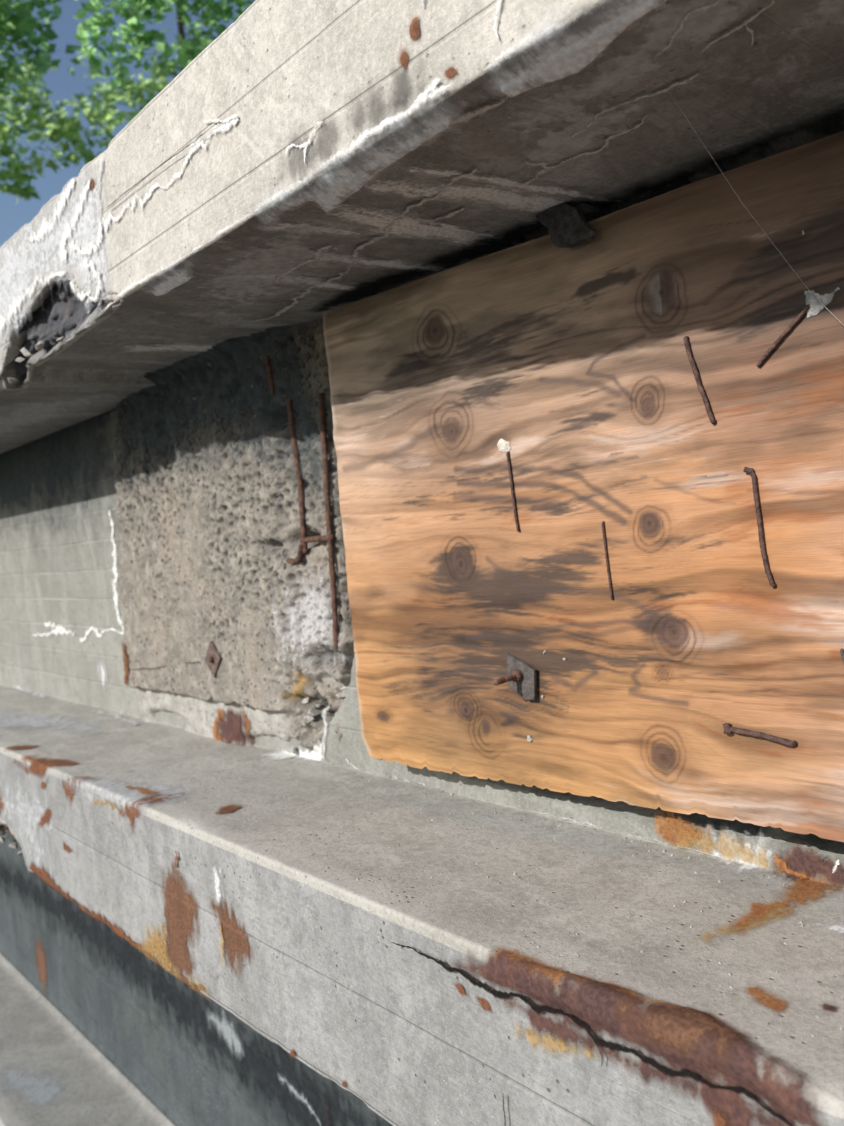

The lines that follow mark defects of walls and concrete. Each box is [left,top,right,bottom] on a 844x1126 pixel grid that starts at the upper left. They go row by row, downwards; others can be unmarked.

crack [98,114,238,232]
crack [286,121,323,162]
spalling [0,272,124,391]
crack [33,510,124,642]
water stain [0,326,319,521]
spalling [113,320,354,754]
rust [265,356,339,649]
rust [30,851,205,992]
water stain [0,863,391,1126]
crack [391,942,791,1126]
rust [455,949,818,1126]
rust [654,811,844,939]